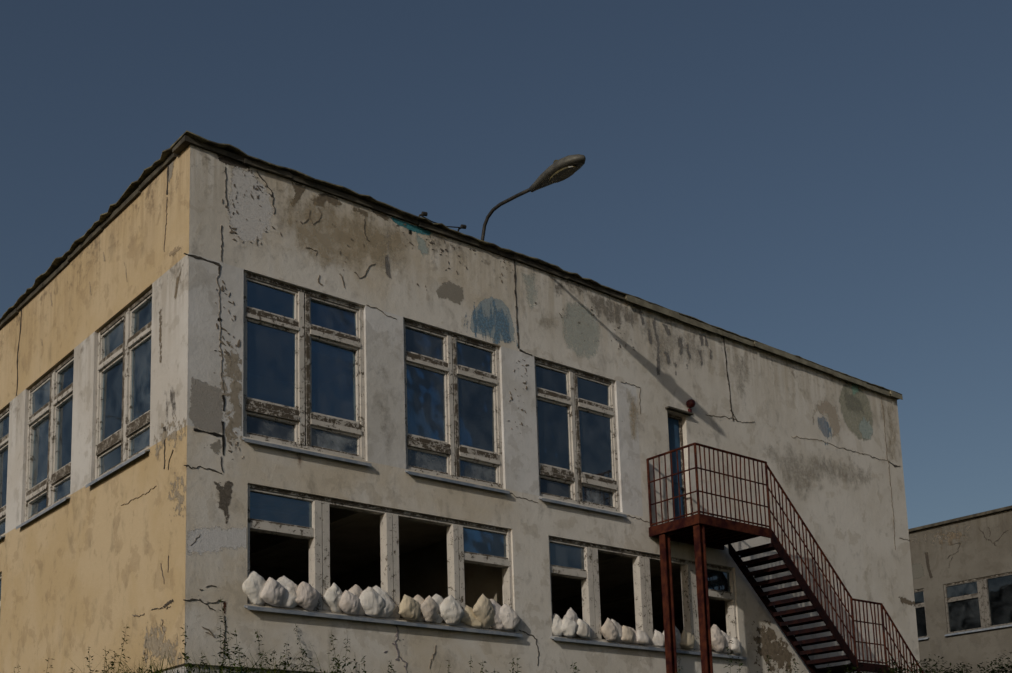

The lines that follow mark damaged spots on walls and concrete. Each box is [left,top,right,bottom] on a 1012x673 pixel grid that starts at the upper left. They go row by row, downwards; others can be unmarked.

spalling [217,154,282,246]
spalling [290,182,342,207]
spalling [373,211,476,305]
crack [121,164,228,506]
spalling [150,280,244,460]
water stain [551,275,712,375]
crack [707,337,755,423]
crack [791,397,910,550]